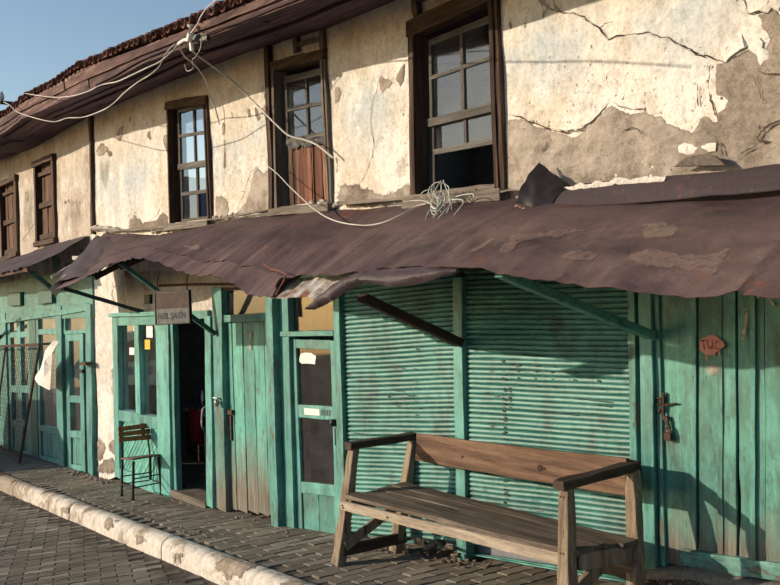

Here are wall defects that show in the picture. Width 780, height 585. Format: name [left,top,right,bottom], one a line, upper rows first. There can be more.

crack [736,0,772,15]
crack [522,0,748,116]
spalling [506,0,780,198]
crack [753,68,780,101]
crack [359,64,405,183]
crack [507,89,645,153]
crack [716,120,780,155]
spalling [215,166,268,222]
spalling [336,183,410,208]
spalling [129,212,168,232]
spalling [97,439,115,474]
peeling [215,555,256,580]